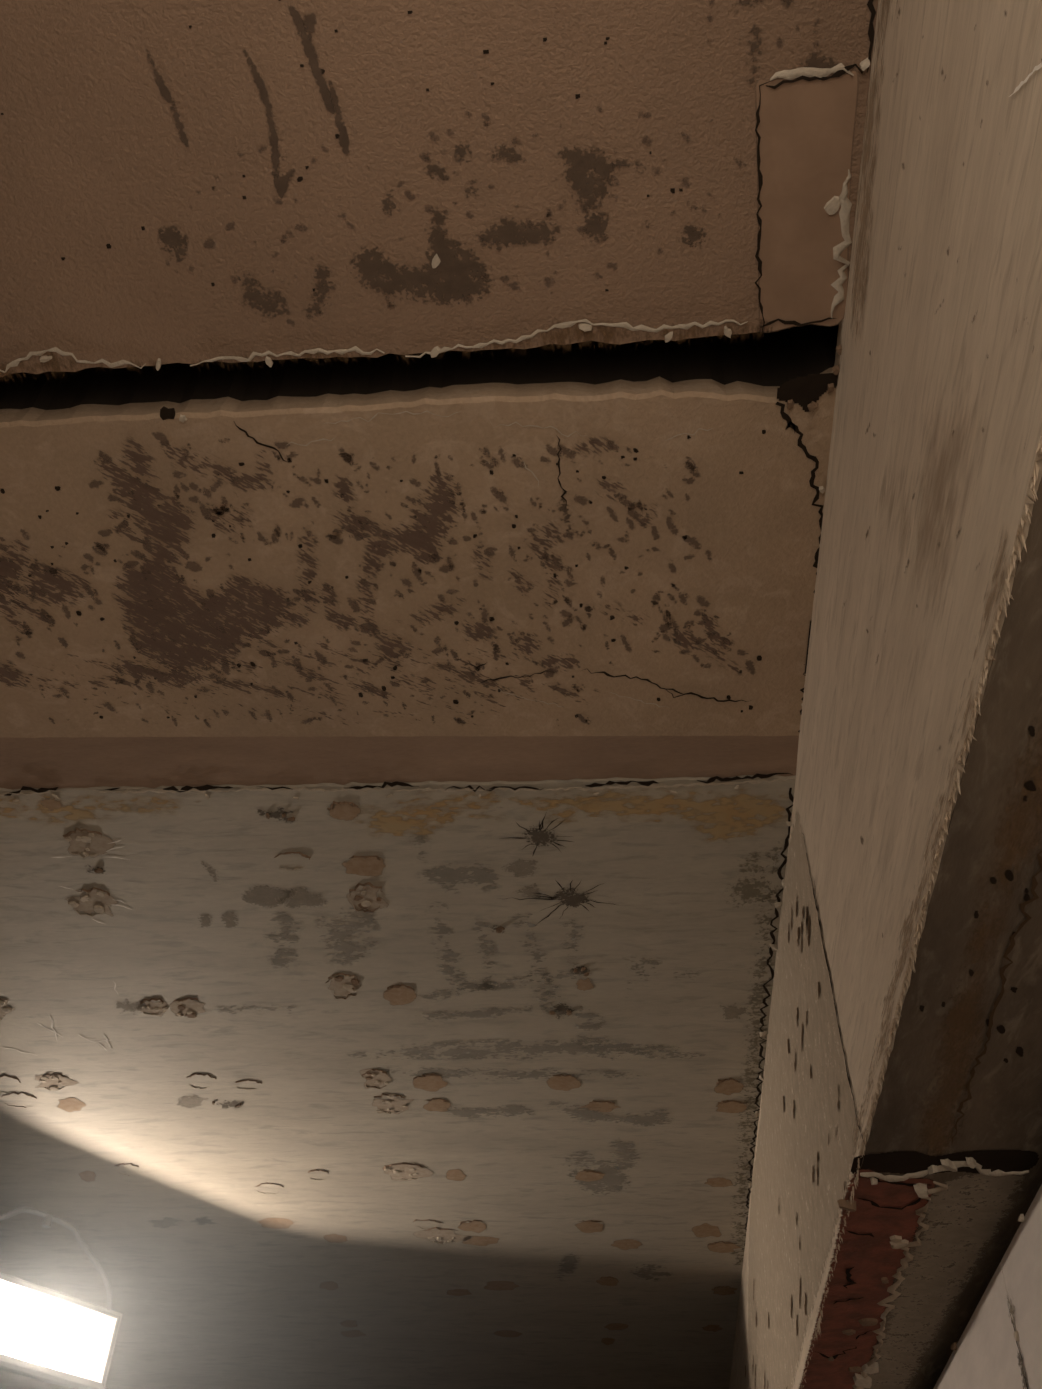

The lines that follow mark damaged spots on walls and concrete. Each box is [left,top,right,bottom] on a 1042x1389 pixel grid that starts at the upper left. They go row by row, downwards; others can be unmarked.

damp [243,50,297,204]
damp [289,6,349,162]
damp [351,146,665,308]
crack [755,0,876,337]
damp [0,432,755,726]
crack [775,402,825,733]
peeling [93,773,795,822]
spalling [116,997,206,1018]
spalling [0,1072,86,1112]
peeling [177,1073,262,1109]
spalling [786,1157,976,1389]
crack [1008,1299,1028,1389]